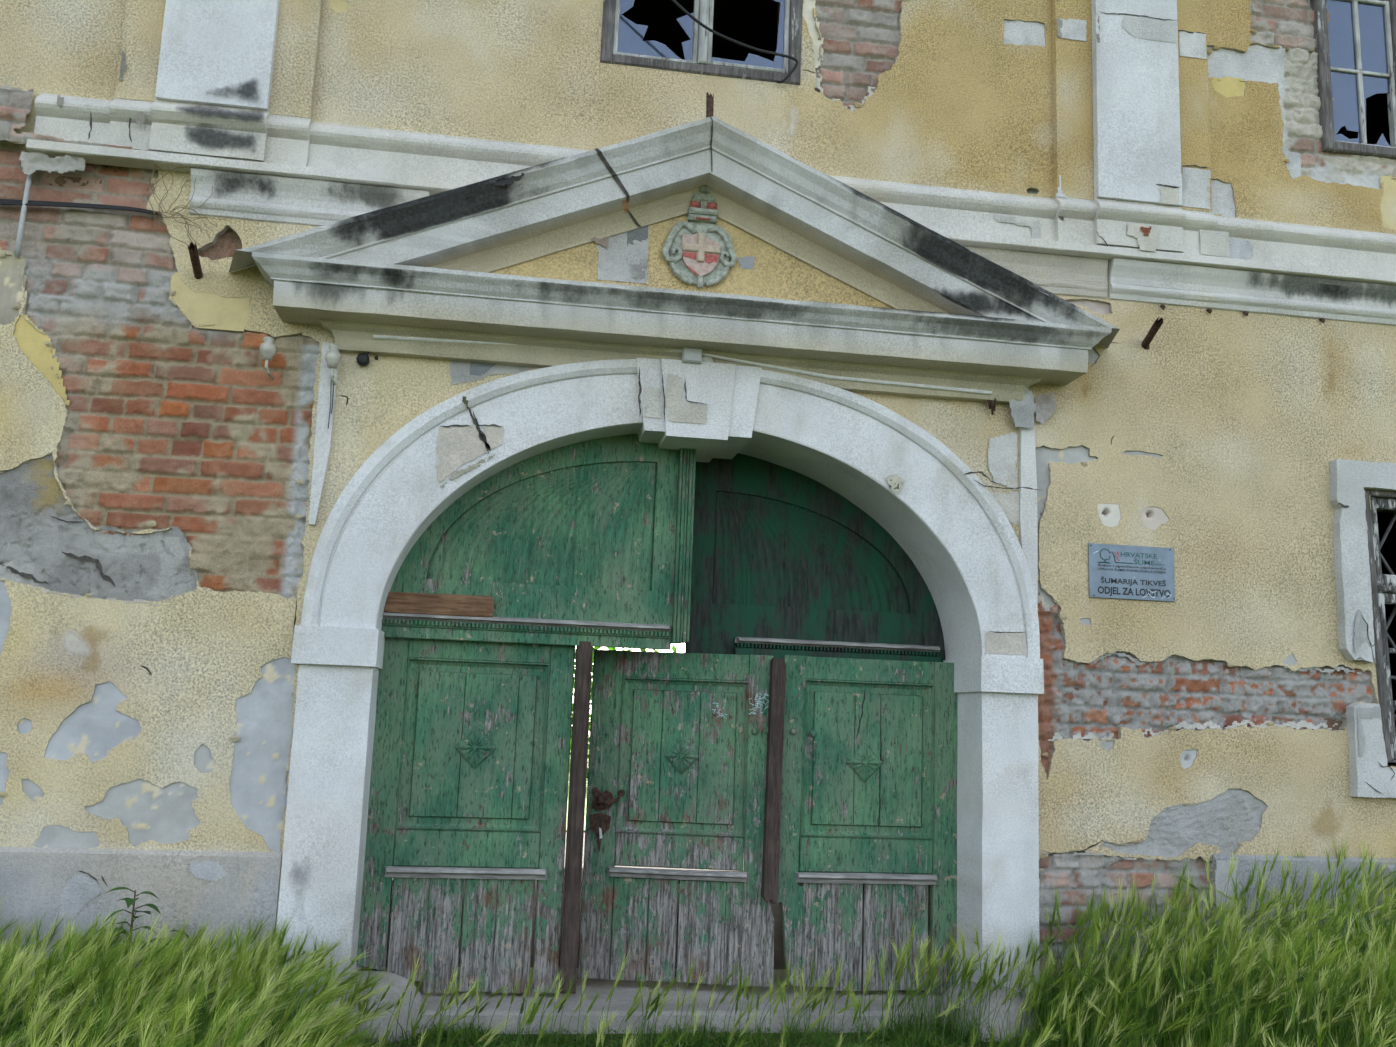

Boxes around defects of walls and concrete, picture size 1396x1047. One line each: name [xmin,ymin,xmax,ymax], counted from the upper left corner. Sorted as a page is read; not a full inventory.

flaking render [802,0,911,112]
flaking render [1207,0,1396,230]
flaking render [0,84,320,599]
damp [336,162,549,240]
damp [540,282,618,295]
damp [638,293,798,317]
damp [849,186,1075,342]
damp [1252,273,1396,303]
flaking render [988,389,1057,490]
flaking render [1038,571,1381,775]
peeling [229,657,295,852]
flaking render [1039,788,1267,961]